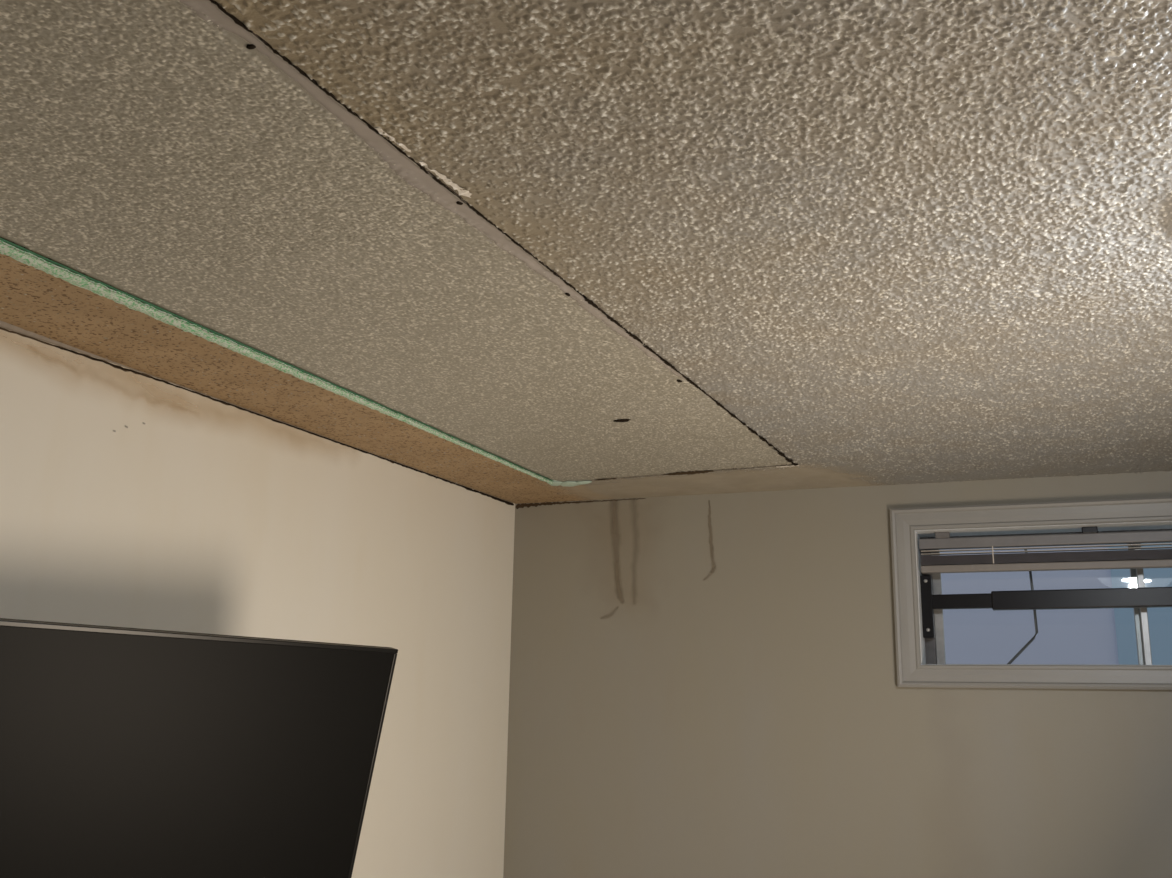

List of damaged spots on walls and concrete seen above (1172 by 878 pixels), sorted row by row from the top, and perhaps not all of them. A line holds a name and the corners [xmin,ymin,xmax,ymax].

damp [0,254,867,603]